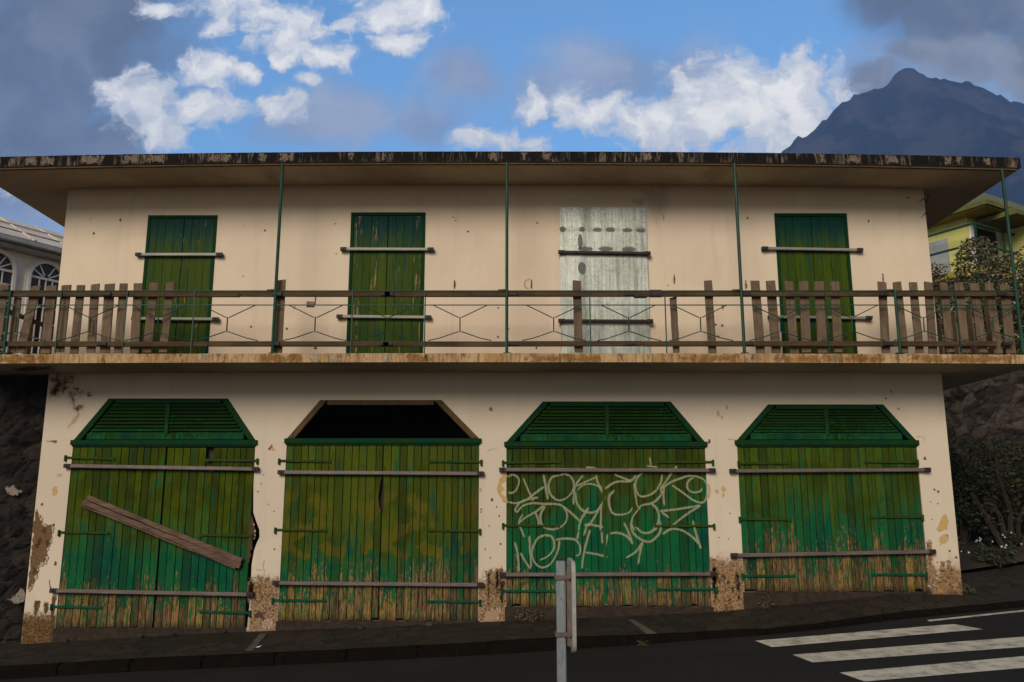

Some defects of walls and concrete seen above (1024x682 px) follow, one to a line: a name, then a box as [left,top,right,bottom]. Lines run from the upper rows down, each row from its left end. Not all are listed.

spalling [28,503,57,592]
spalling [926,539,938,588]
spalling [254,611,273,629]
spalling [484,608,501,621]